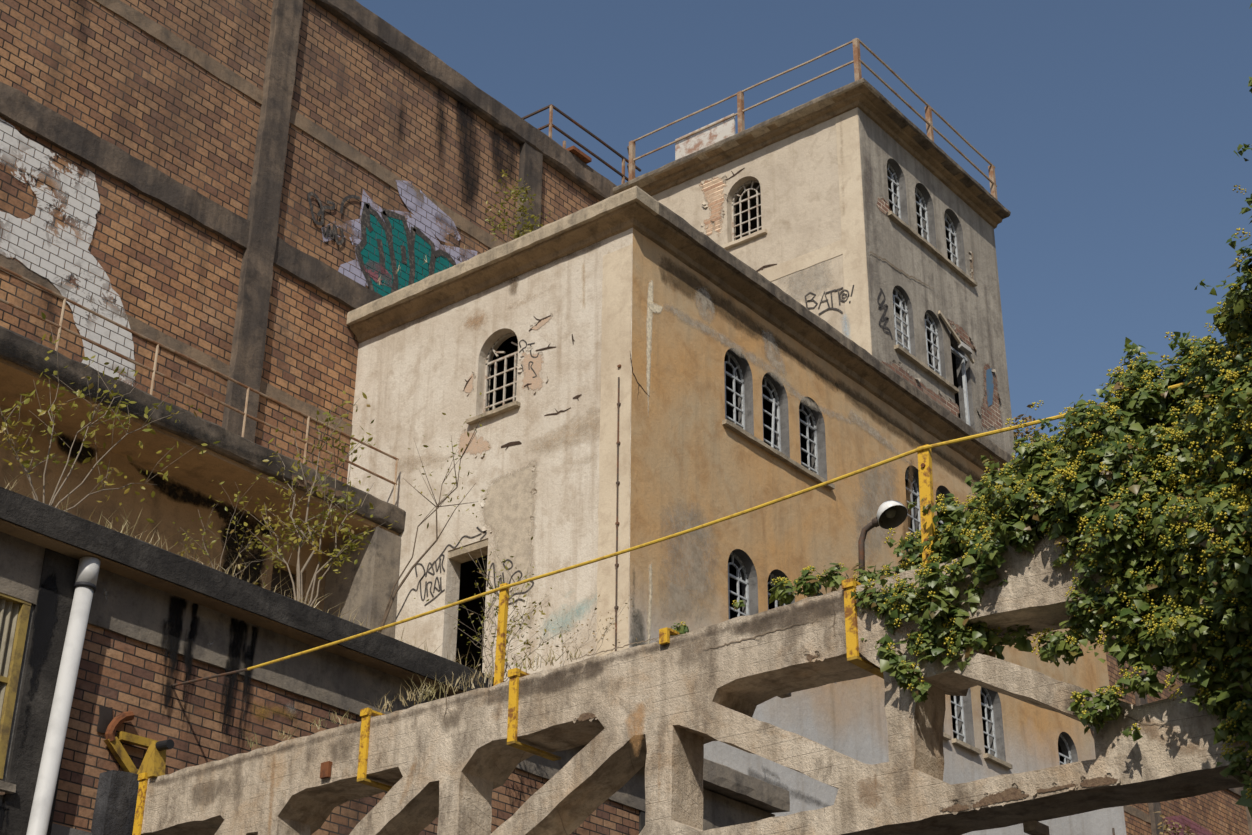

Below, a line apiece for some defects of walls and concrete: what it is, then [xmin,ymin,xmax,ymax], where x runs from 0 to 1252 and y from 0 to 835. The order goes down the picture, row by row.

water stain [492,130,514,181]
peeling [699,175,728,236]
peeling [517,346,548,393]
peeling [456,427,491,457]
water stain [22,574,58,743]
water stain [161,596,199,716]
water stain [216,619,290,792]